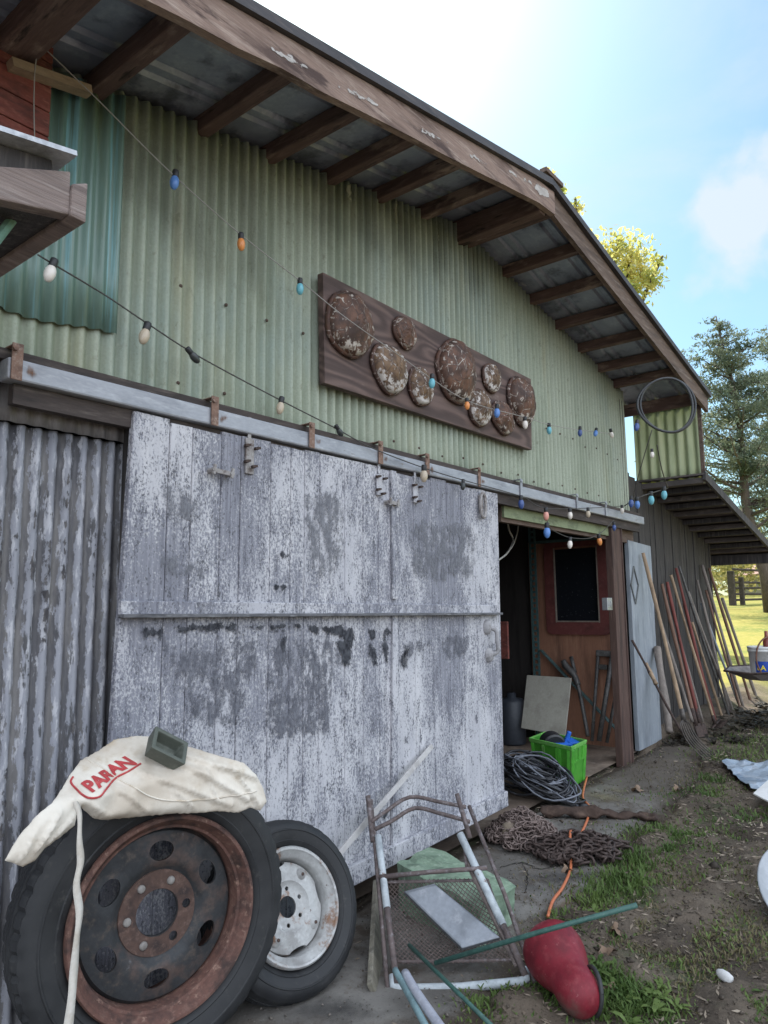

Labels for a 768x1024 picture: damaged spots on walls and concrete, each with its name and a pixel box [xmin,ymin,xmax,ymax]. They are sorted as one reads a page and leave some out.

peeling [30,521,68,643]
peeling [163,483,198,522]
peeling [300,491,345,580]
peeling [409,519,477,582]
peeling [140,622,355,739]
peeling [368,628,470,670]